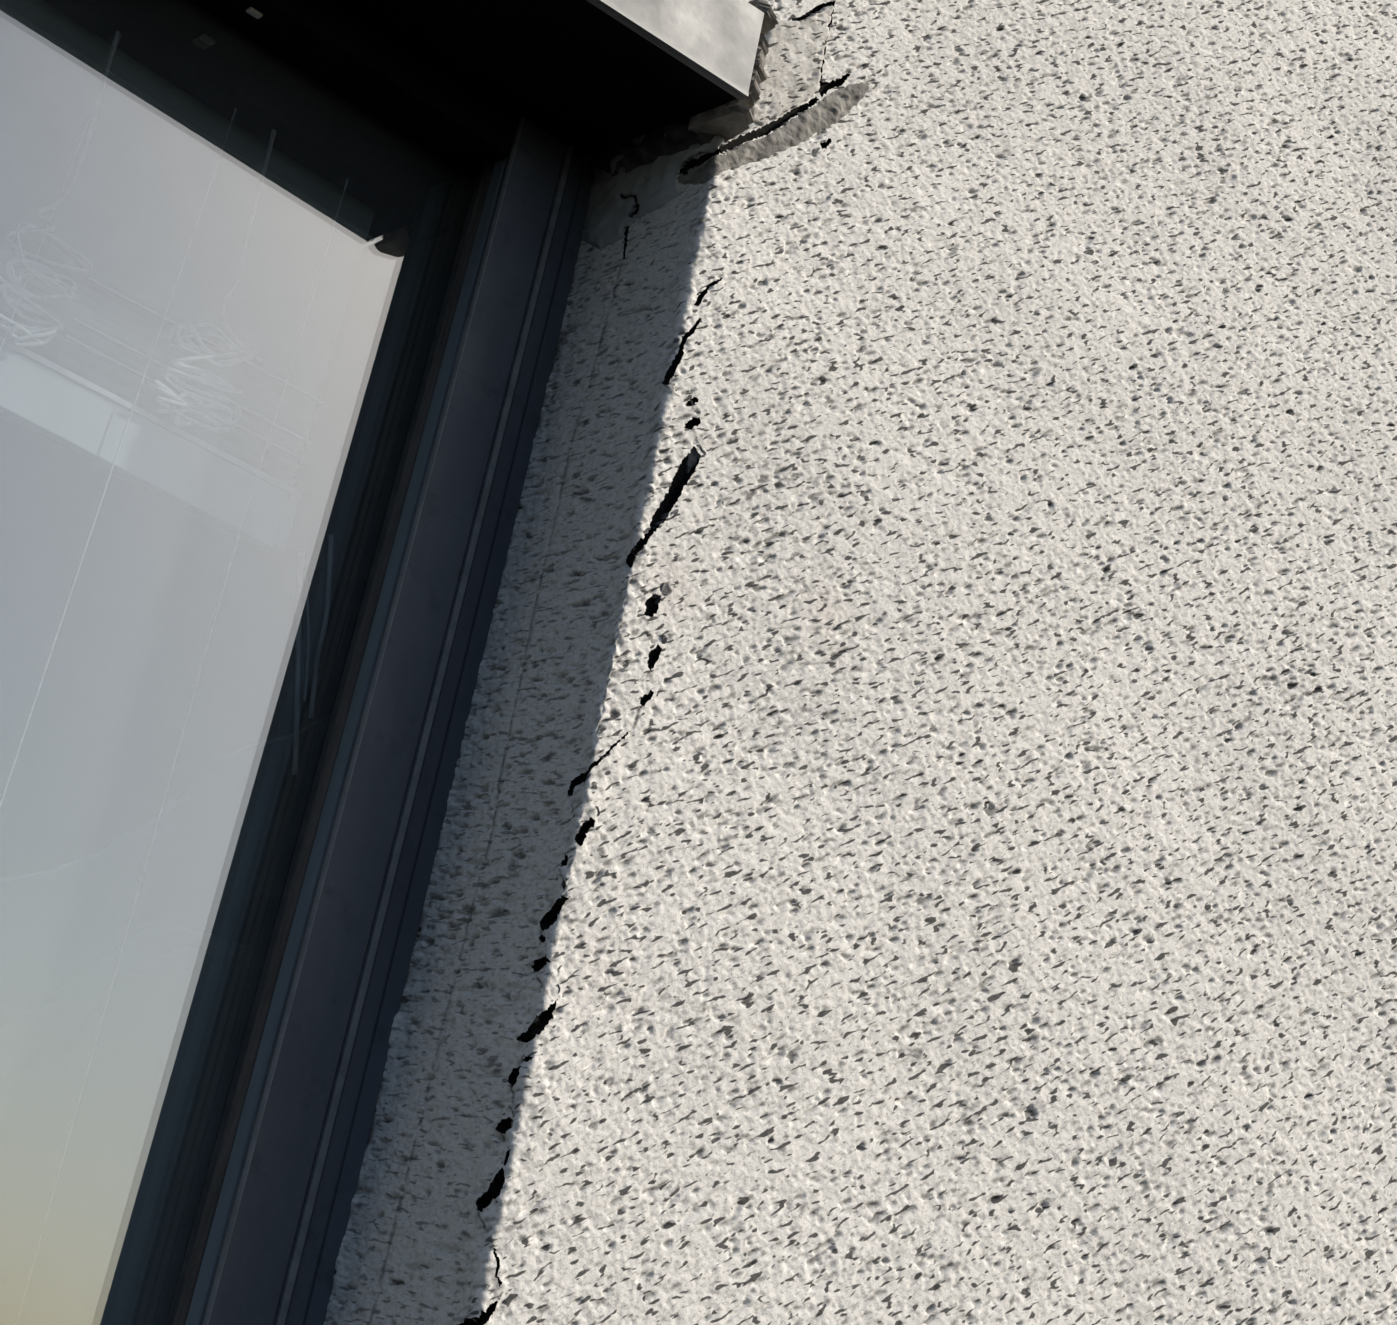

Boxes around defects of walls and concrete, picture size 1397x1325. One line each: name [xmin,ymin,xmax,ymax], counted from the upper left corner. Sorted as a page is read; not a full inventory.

crack [679,1,851,175]
flaking render [751,6,834,126]
flaking render [811,138,831,157]
crack [623,196,639,260]
crack [662,277,722,430]
crack [458,582,672,1325]